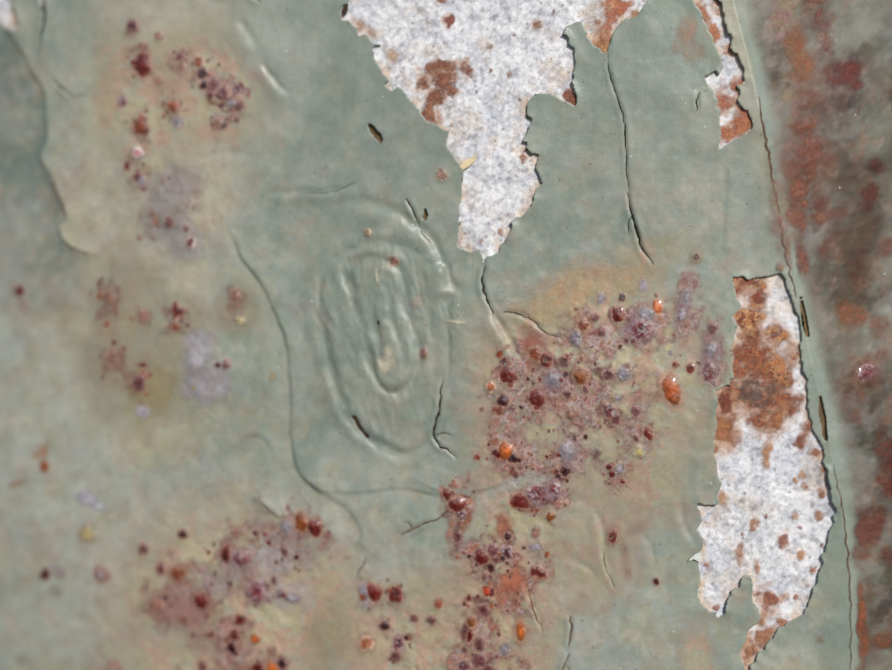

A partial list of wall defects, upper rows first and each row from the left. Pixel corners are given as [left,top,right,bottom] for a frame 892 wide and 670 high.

peeling [0,0,19,31]
rust [102,19,251,192]
peeling [341,0,647,263]
crack [608,54,654,264]
peeling [693,0,753,149]
crack [759,98,797,298]
rust [90,270,190,416]
rust [129,266,727,670]
crack [433,378,457,458]
peeling [689,273,836,670]
crack [833,463,852,670]
rust [856,584,891,656]